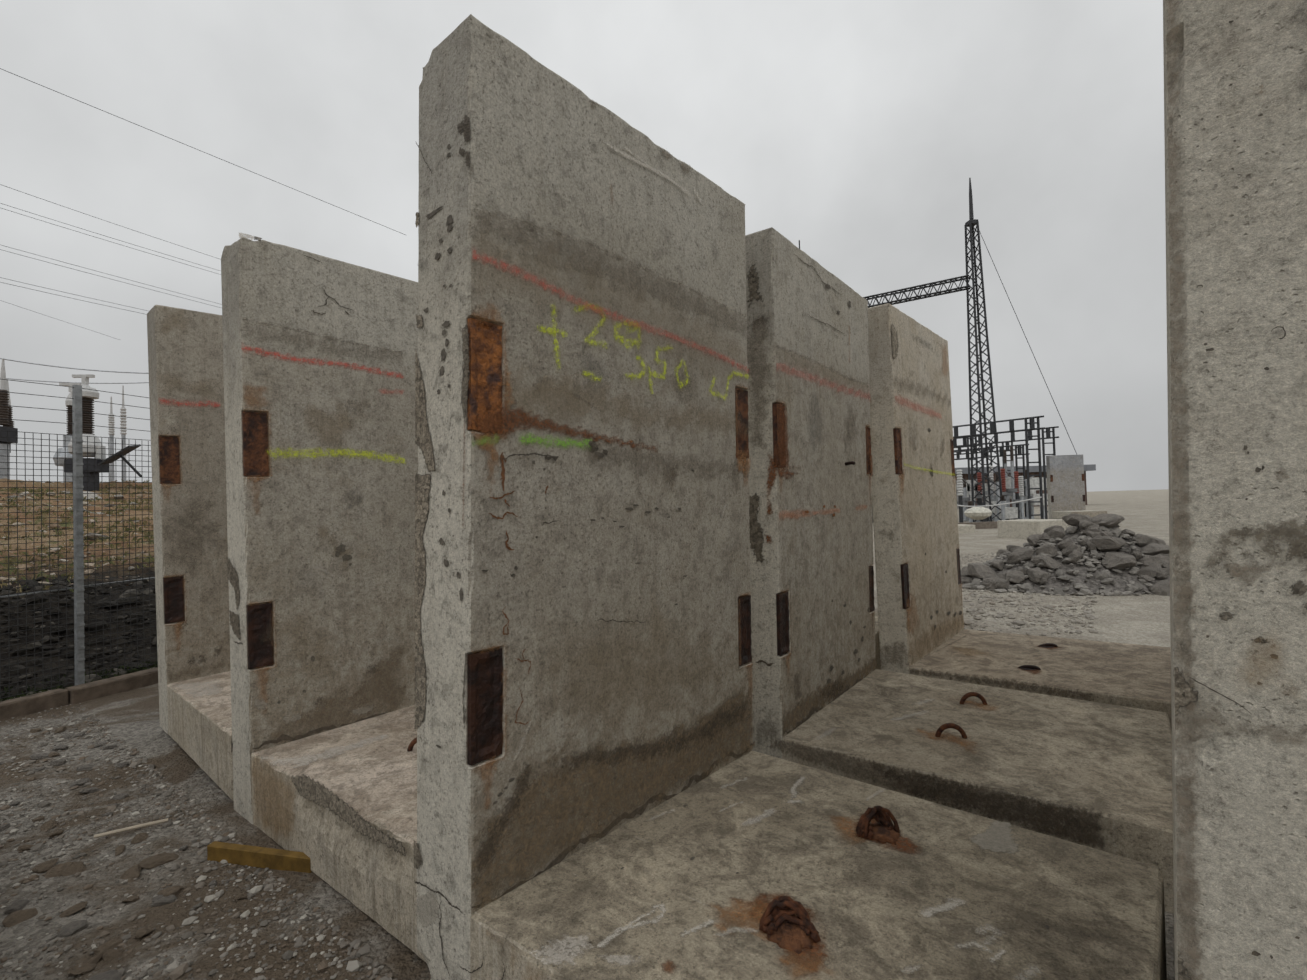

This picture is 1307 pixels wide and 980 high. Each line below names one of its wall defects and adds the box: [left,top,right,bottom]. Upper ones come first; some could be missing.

crack [304,255,354,315]
rust [463,374,656,501]
crack [784,676,866,734]
water stain [472,646,1103,911]
crack [414,744,753,976]